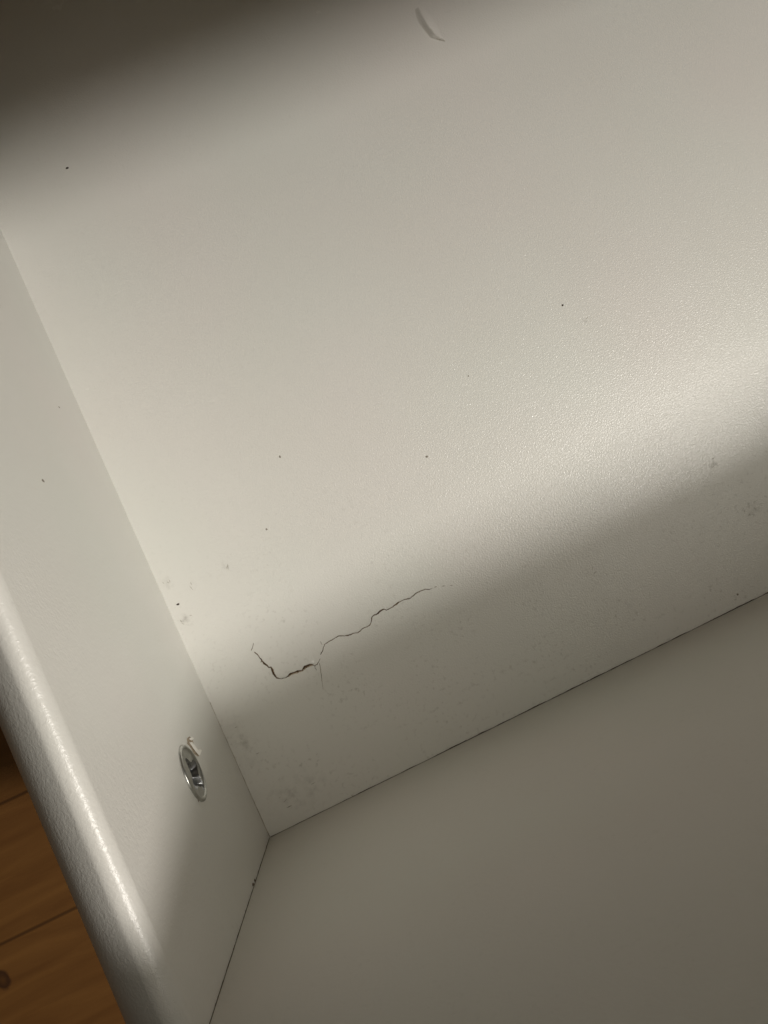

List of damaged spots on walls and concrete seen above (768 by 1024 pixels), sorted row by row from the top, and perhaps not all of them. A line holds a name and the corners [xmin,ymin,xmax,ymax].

crack [209,585,768,1024]